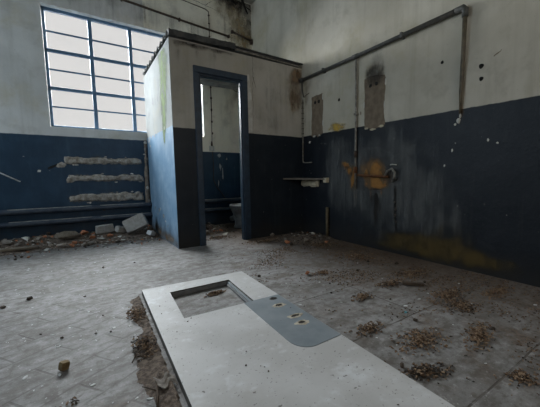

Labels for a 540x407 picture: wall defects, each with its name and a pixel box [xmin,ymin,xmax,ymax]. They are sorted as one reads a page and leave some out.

corrosion [342,161,387,194]